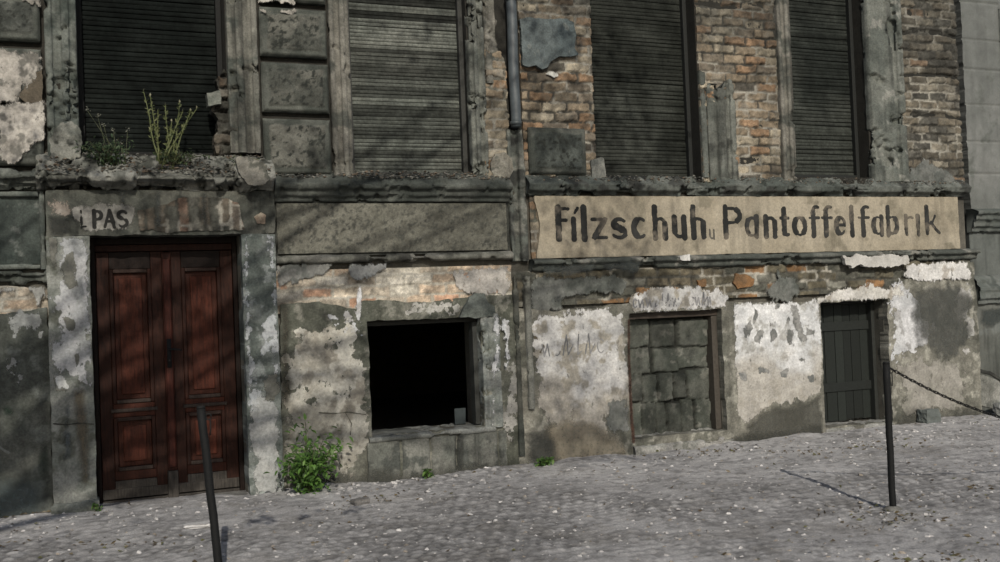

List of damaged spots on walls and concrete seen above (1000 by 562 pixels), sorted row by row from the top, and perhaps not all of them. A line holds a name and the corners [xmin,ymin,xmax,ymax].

flaking render [258,0,296,15]
flaking render [0,47,82,164]
flaking render [528,197,539,259]
peeling [0,197,249,389]
peeling [242,213,975,495]
spalling [980,375,1000,416]